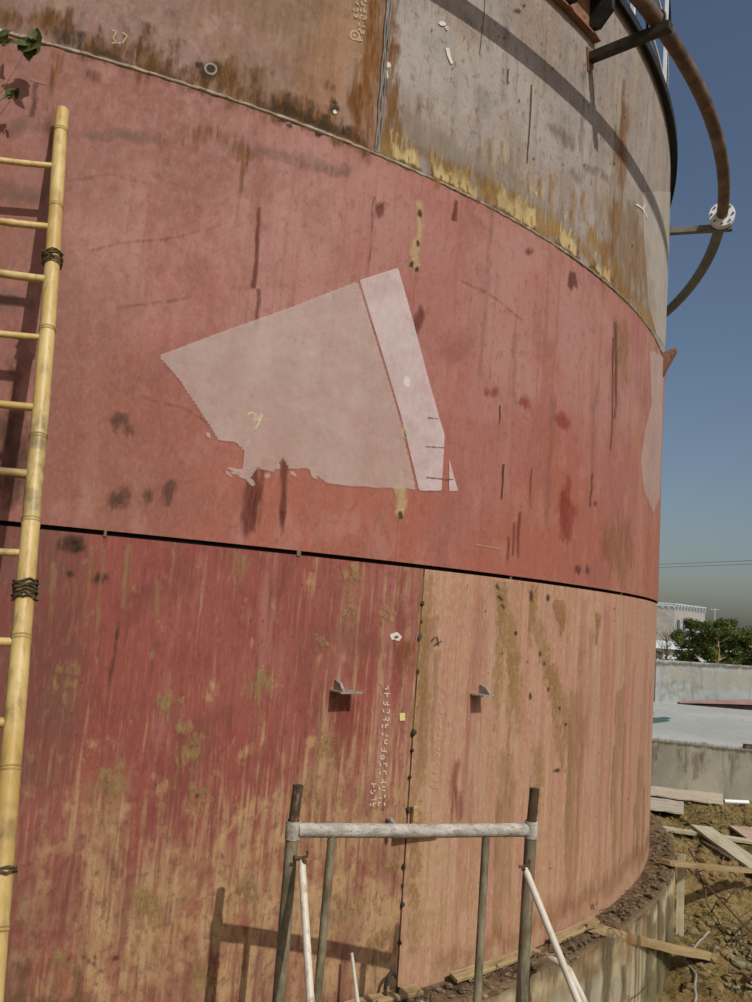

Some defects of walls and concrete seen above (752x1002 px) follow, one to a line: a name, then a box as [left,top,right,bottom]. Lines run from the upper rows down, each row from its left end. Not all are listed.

corrosion [0,0,398,154]
corrosion [382,89,617,292]
water stain [0,414,28,505]